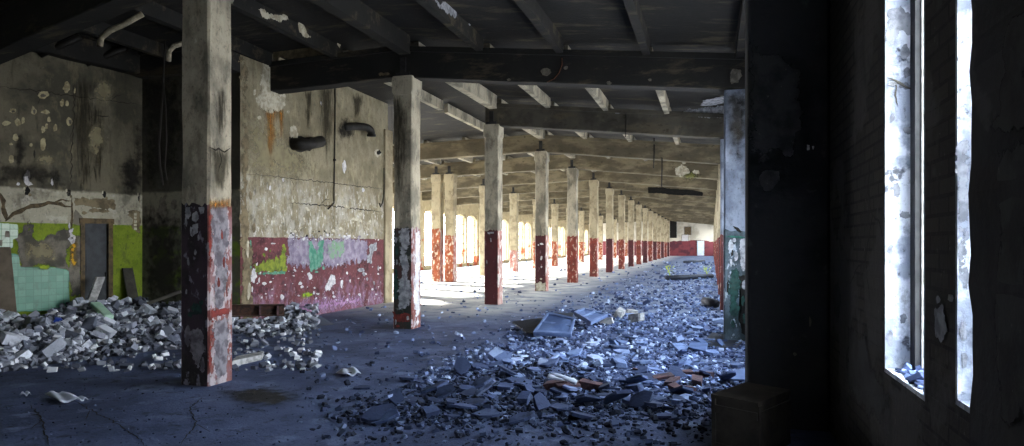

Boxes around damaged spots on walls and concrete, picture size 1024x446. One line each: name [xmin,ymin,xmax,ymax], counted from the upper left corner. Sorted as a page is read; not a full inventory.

peeling [259,9,311,38]
peeling [435,0,457,18]
peeling [885,6,911,90]
peeling [2,81,76,163]
crack [0,82,141,229]
corrosion [248,110,307,178]
spalling [0,189,116,297]
peeling [185,56,381,378]
peeling [727,226,745,335]
peeling [934,294,953,343]